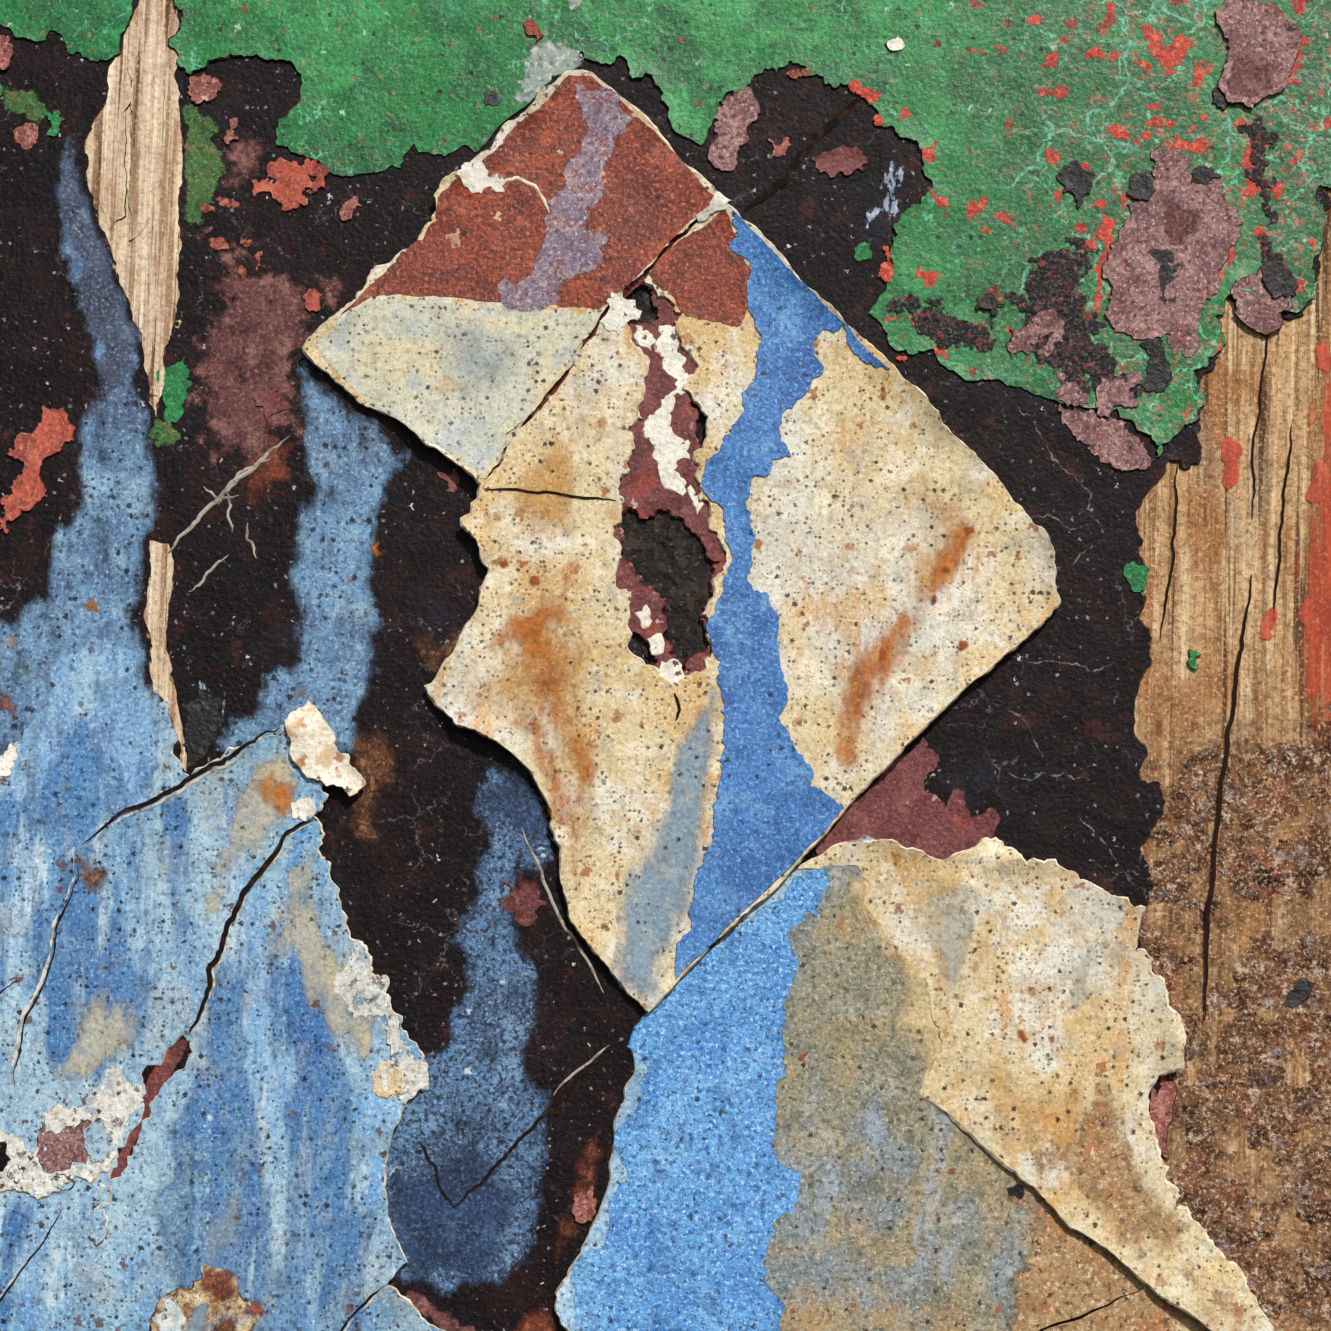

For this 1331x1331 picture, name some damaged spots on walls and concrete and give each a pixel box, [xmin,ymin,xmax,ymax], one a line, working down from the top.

peeling [0,82,65,137]
peeling [786,68,812,79]
peeling [0,143,166,837]
peeling [148,356,202,447]
crack [488,219,698,477]
peeling [181,70,1274,1331]
crack [1204,335,1293,1021]
crack [0,727,282,1092]
crack [189,819,311,1033]
peeling [0,1036,189,1245]
crack [420,1045,609,1208]
crack [0,1207,63,1302]